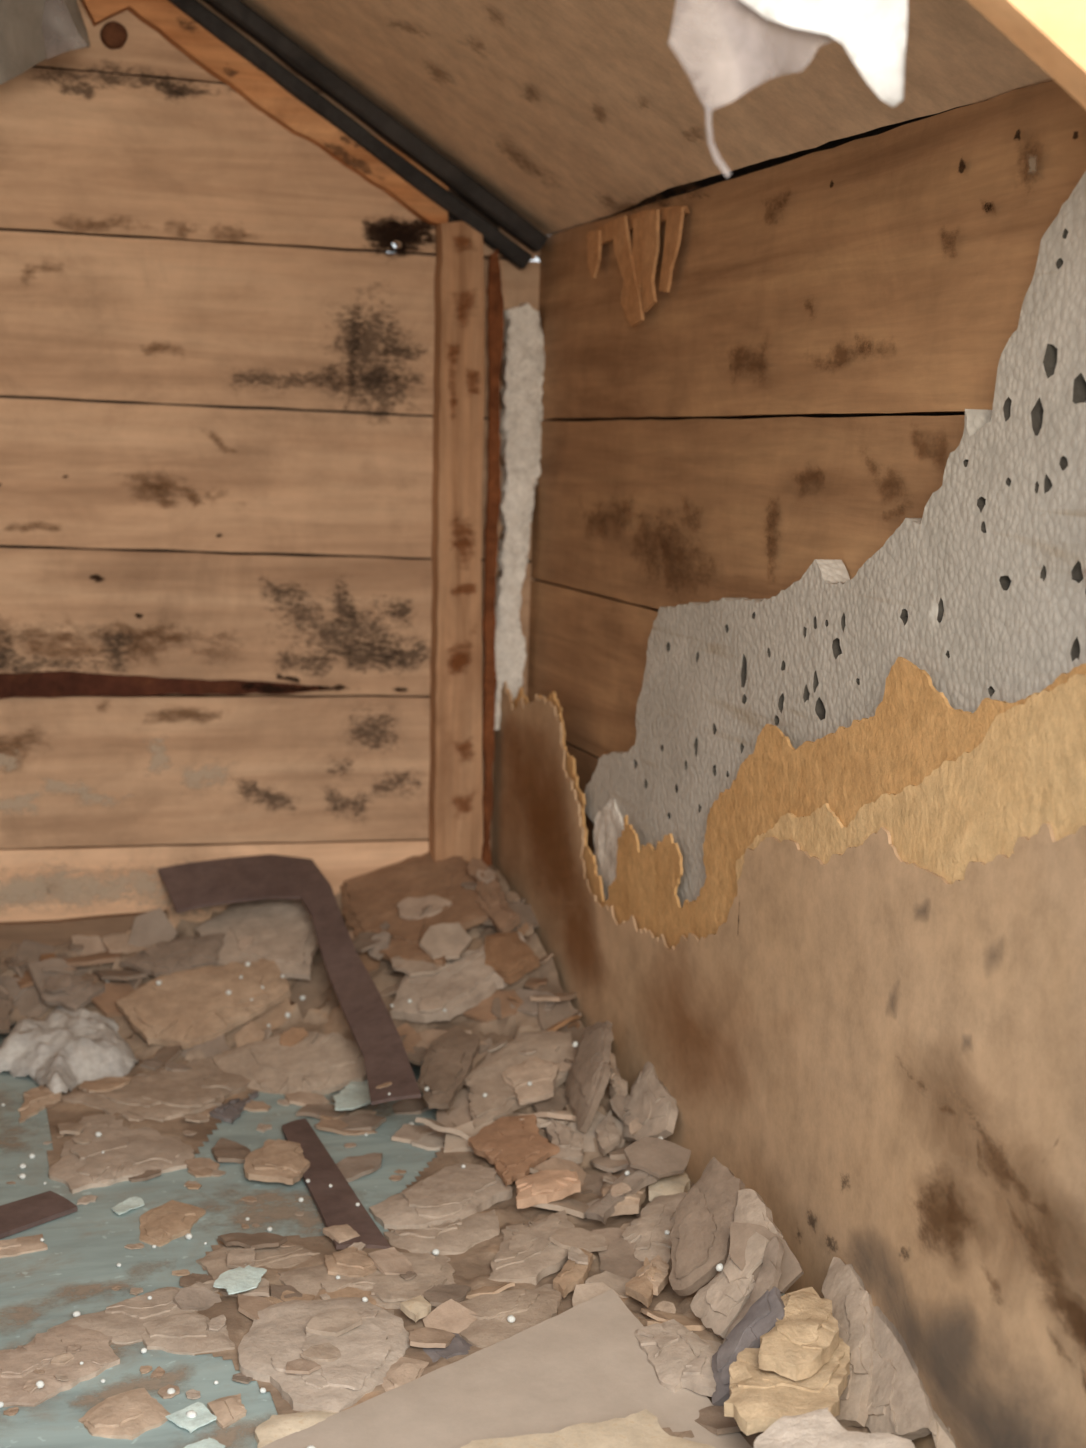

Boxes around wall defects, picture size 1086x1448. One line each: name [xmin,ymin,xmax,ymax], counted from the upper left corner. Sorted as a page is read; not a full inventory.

damp [236,307,424,414]
damp [0,628,180,673]
damp [264,583,427,673]
crack [240,674,349,694]
damp [241,781,295,809]
damp [327,773,420,816]